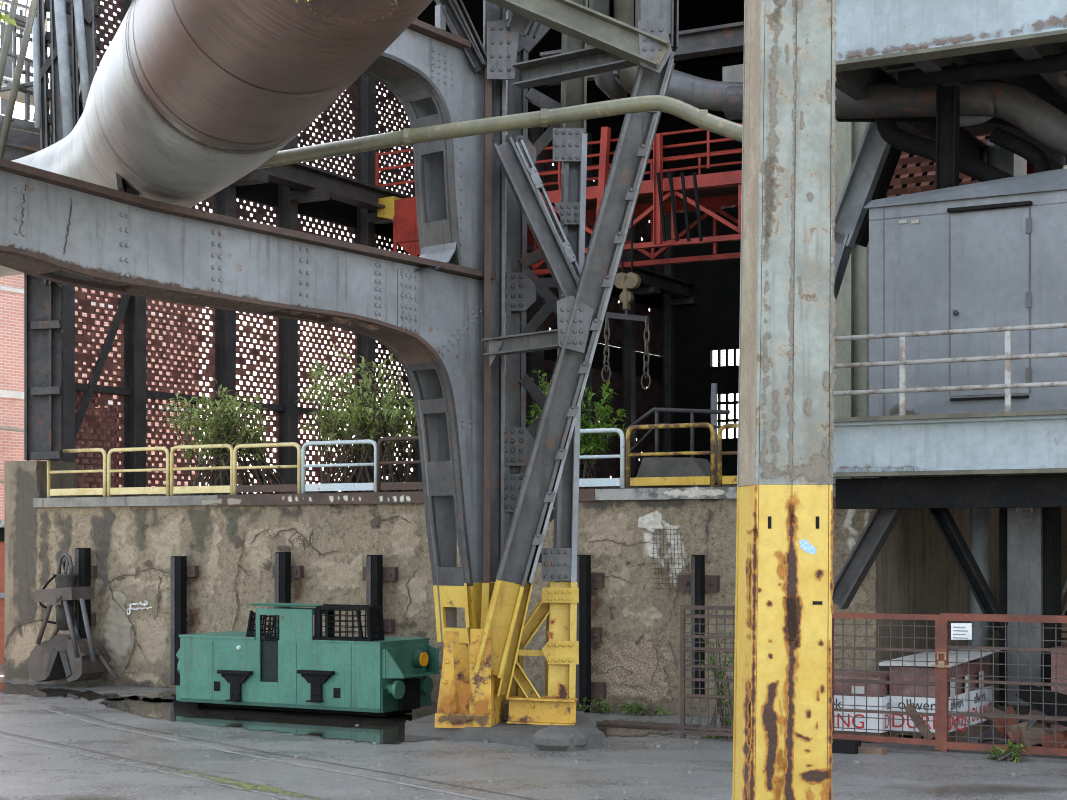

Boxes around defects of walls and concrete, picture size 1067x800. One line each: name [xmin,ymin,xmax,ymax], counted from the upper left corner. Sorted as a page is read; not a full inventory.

corrosion [838,15,1067,59]
peeling [759,0,837,484]
crack [372,514,412,524]
crack [4,619,42,648]
crack [108,566,169,674]
crack [232,528,337,631]
crack [403,567,419,619]
spalling [578,510,685,708]
corrosion [742,485,834,800]
corrosion [439,679,493,727]
corrosion [543,683,568,699]